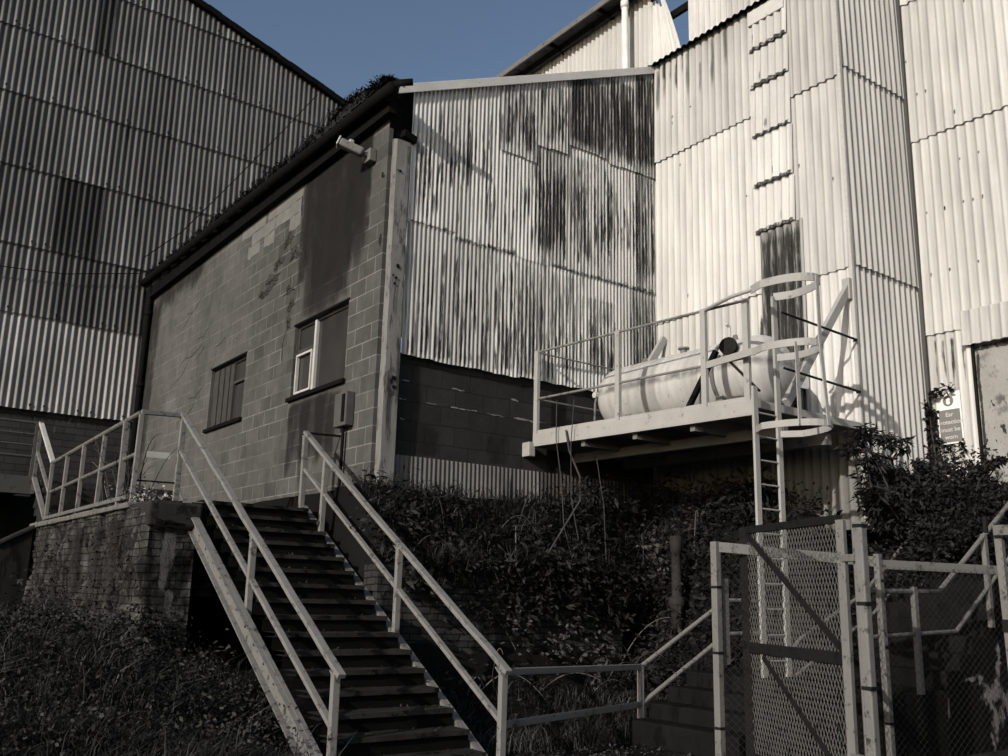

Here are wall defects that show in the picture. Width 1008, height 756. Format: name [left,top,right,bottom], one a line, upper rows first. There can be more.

water stain [299,132,373,312]